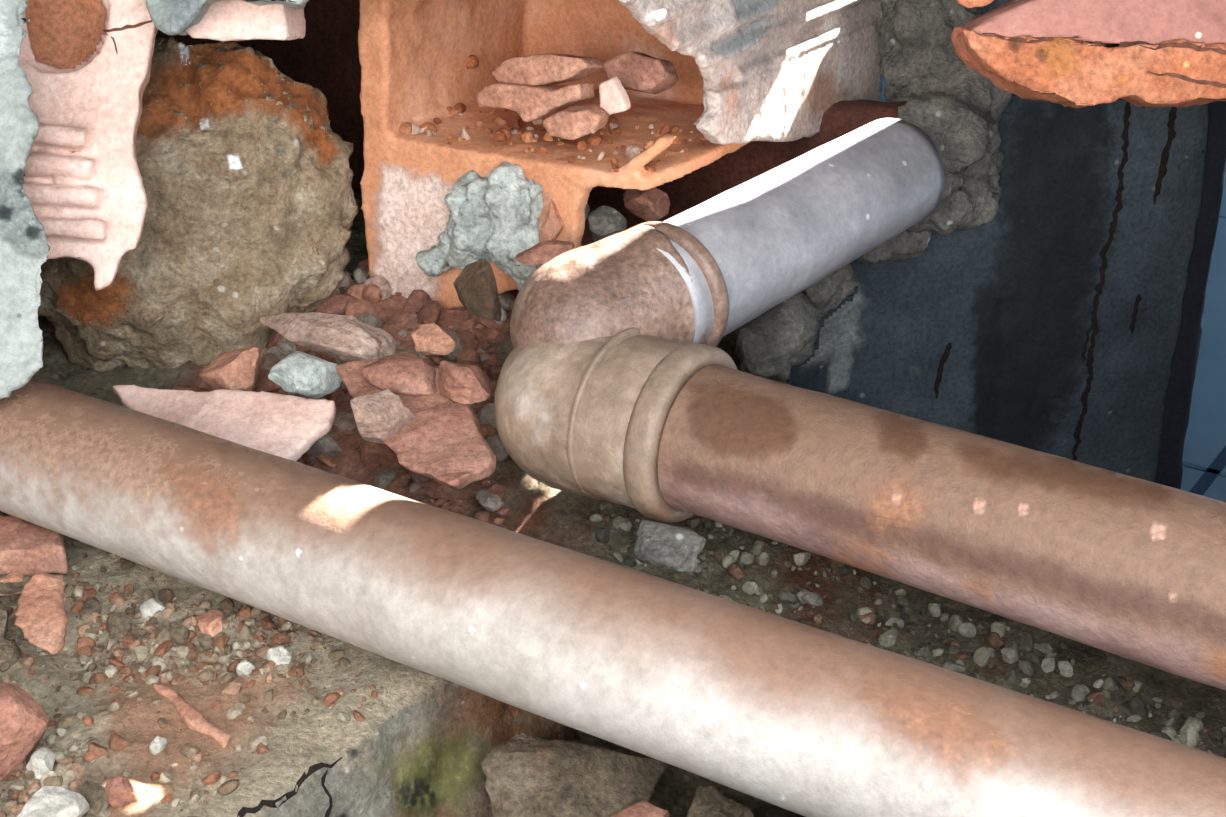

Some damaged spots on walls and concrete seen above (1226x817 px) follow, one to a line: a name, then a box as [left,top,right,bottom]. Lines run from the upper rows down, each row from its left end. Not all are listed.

spalling [169,0,199,34]
spalling [951,0,1226,109]
crack [982,33,1226,205]
spalling [0,169,48,258]
crack [1072,102,1131,461]
crack [1129,294,1142,334]
crack [237,757,342,817]